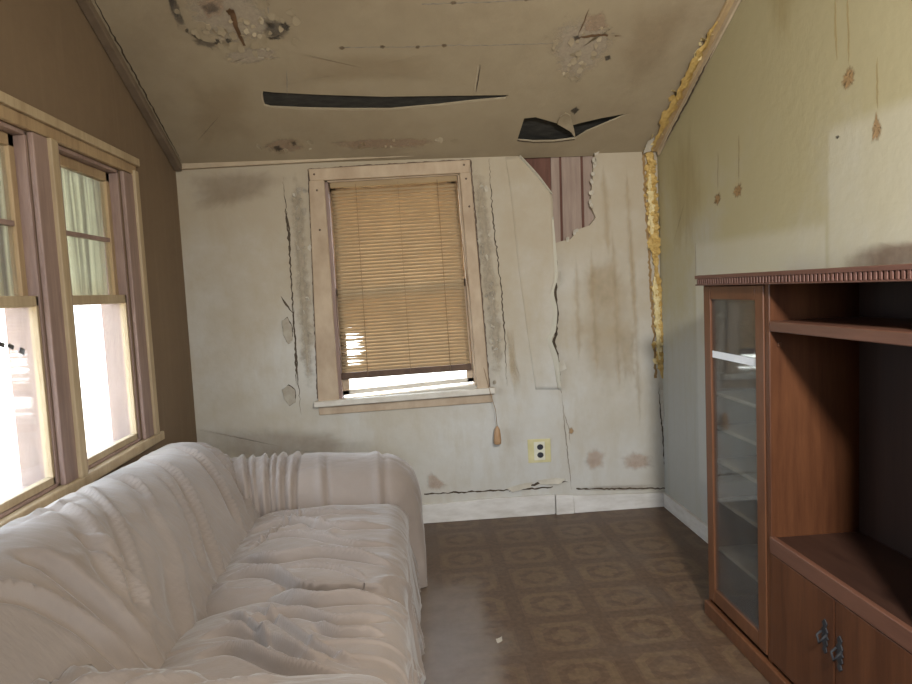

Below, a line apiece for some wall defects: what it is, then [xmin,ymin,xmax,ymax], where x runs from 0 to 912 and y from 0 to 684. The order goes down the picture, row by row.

peeling [169,0,301,63]
damp [843,69,854,88]
damp [873,114,881,138]
peeling [477,164,507,366]